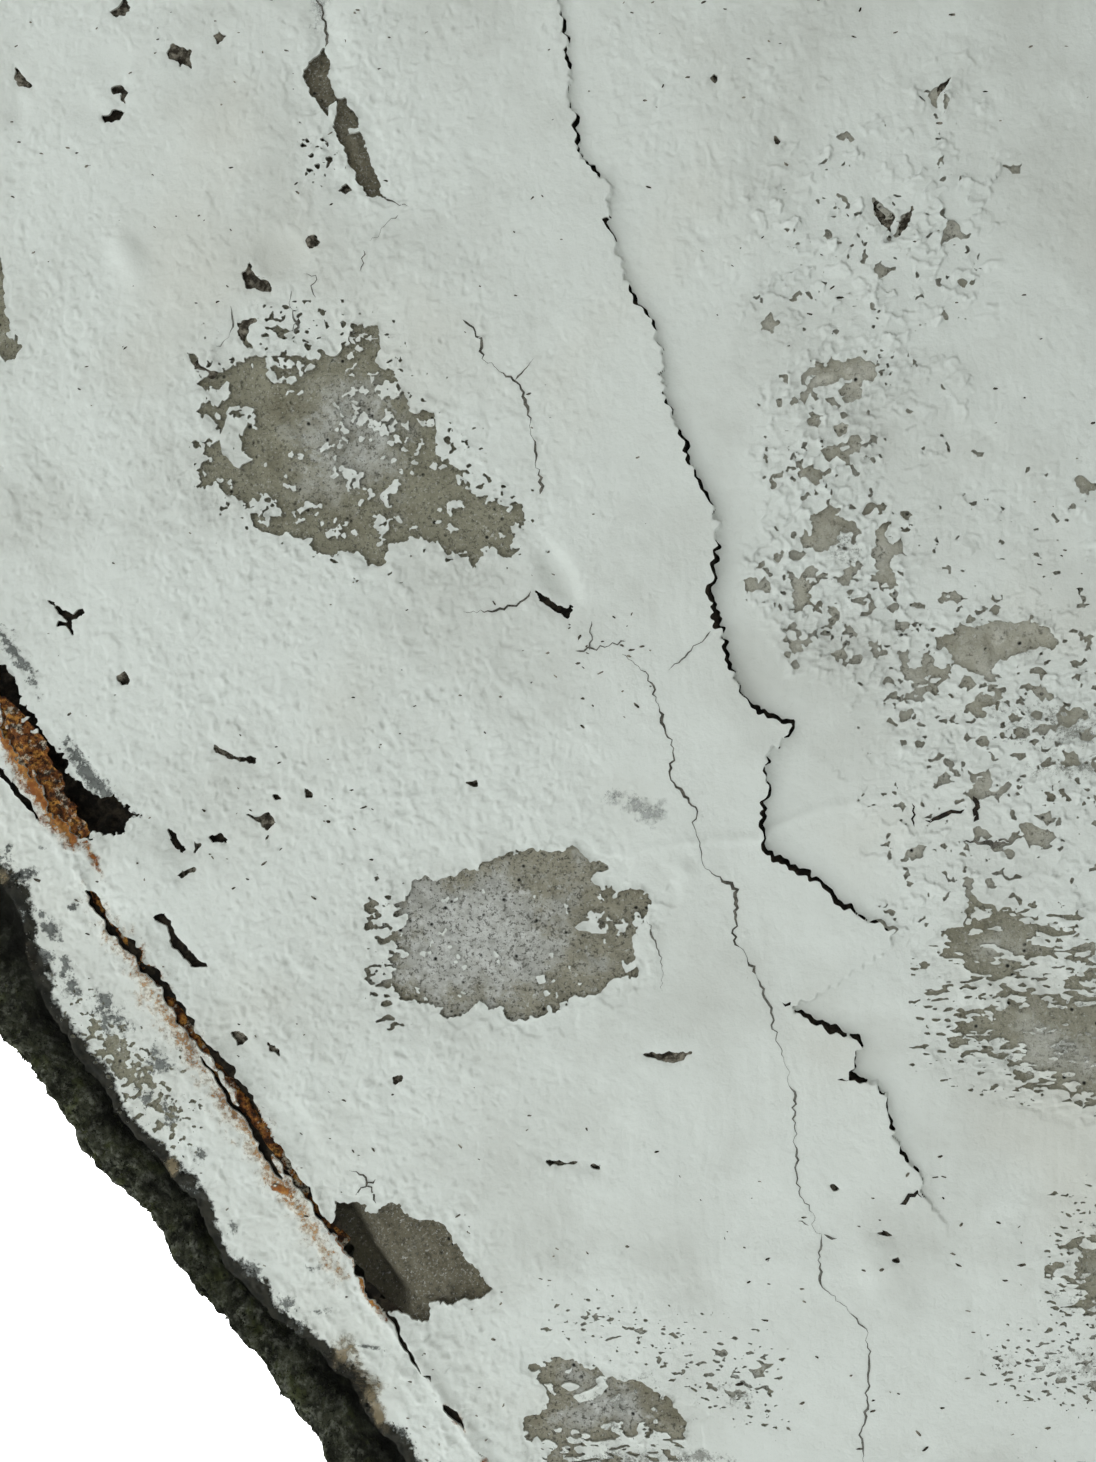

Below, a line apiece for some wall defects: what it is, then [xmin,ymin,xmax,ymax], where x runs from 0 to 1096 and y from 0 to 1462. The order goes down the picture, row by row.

crack [559,12,600,177]
spalling [189,264,534,583]
crack [0,768,39,820]
corrosion [0,716,102,873]
spalling [364,845,652,1030]
crack [577,285,925,1460]
peeling [744,350,1096,1116]
crack [86,890,376,1235]
corrosion [102,912,388,1321]
spalling [335,1202,492,1321]
crack [364,1282,464,1428]
spalling [523,1289,784,1462]